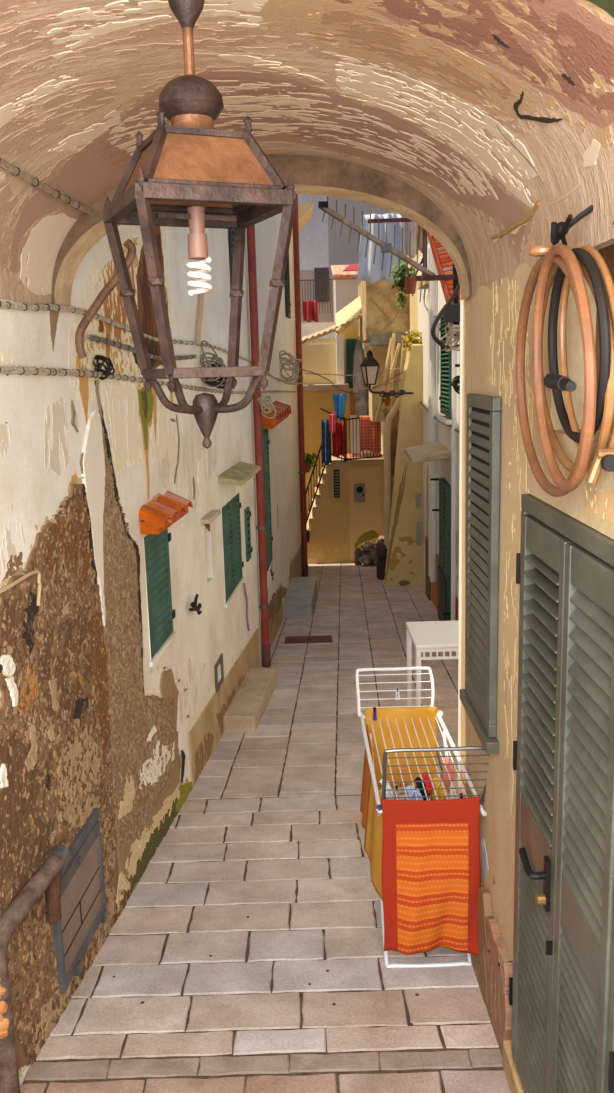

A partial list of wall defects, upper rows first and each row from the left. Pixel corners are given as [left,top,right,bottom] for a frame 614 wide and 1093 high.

spalling [220,0,614,167]